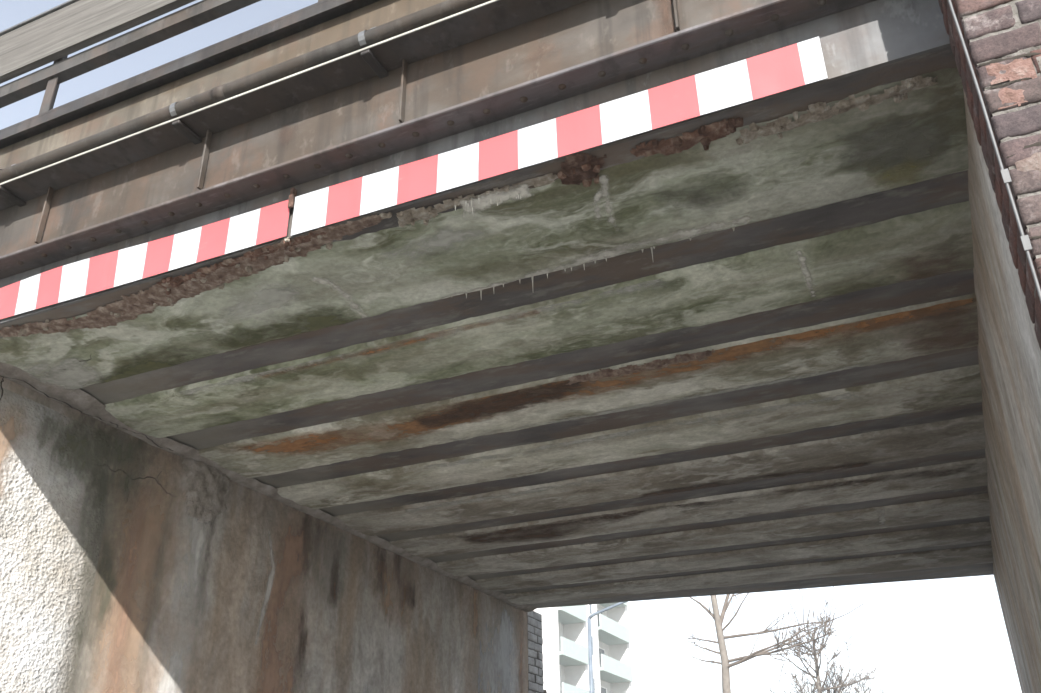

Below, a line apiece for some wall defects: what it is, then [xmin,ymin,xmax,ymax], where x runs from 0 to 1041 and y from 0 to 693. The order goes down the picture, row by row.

spalling [1015,152,1041,172]
leakage [454,184,531,217]
leakage [594,176,612,221]
spalling [0,153,607,338]
leakage [641,217,749,259]
leakage [443,251,622,299]
leakage [30,359,99,389]
corrosion [245,298,974,454]
crack [0,355,178,503]
leakage [40,418,144,693]
leakage [159,657,177,693]